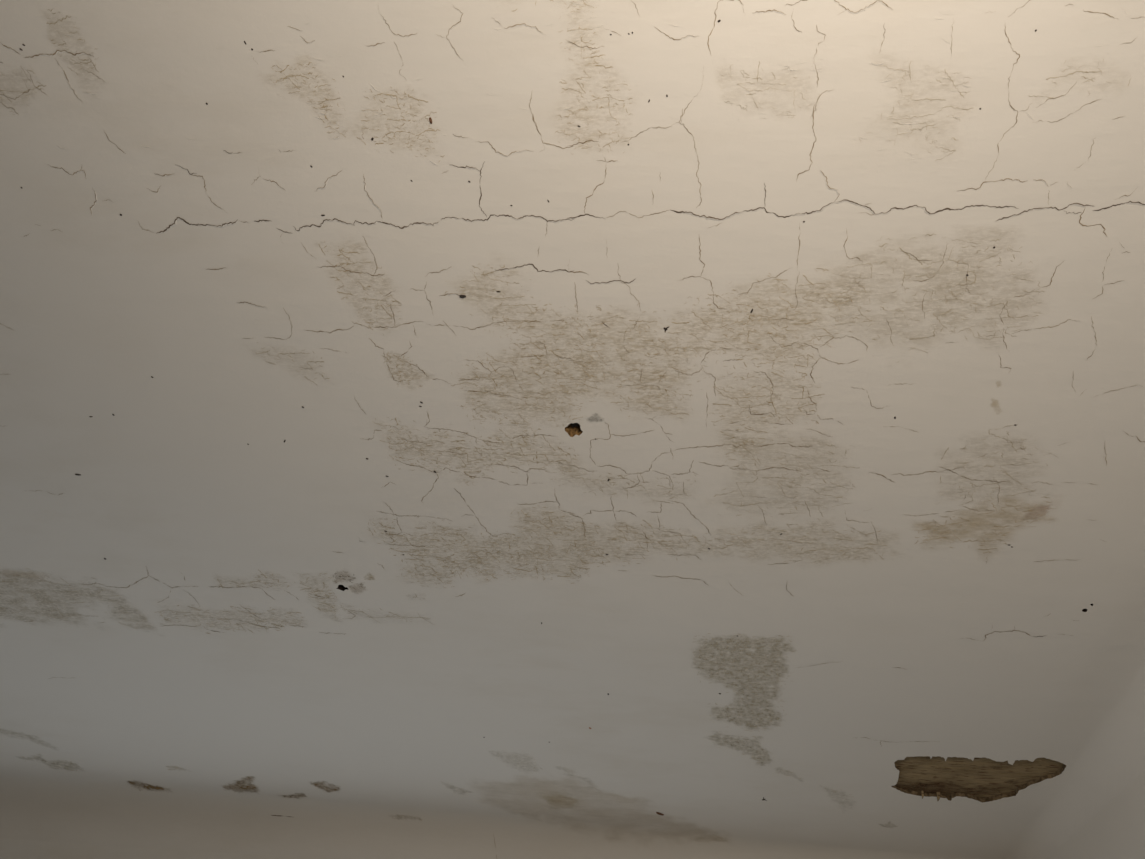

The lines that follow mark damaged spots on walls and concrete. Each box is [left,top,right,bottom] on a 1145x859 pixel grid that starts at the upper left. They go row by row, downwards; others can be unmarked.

crack [0,9,100,115]
crack [79,0,1145,635]
flaking render [891,756,1066,803]